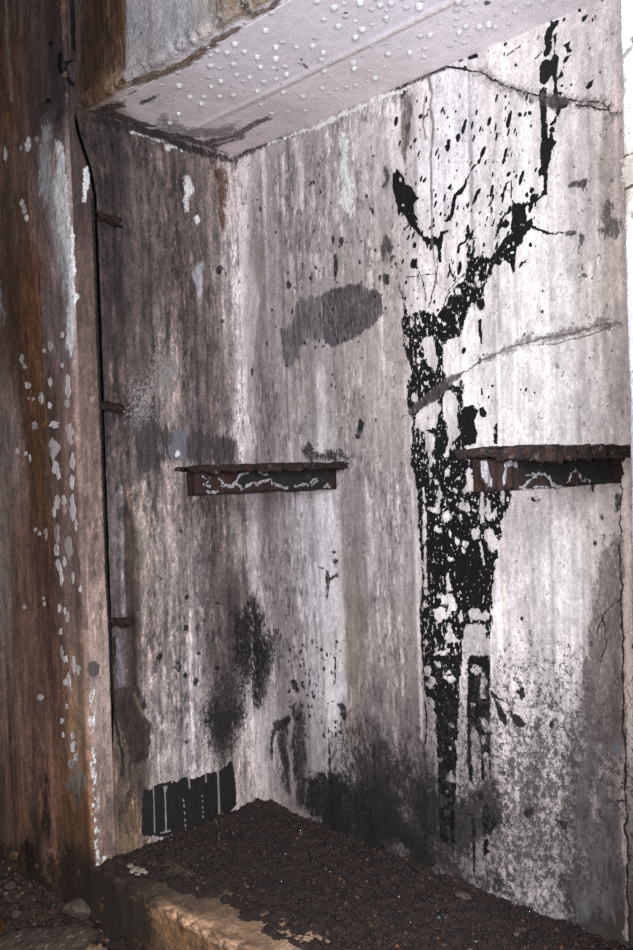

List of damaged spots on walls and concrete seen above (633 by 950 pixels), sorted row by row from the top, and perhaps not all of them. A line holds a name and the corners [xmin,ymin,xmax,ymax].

corrosion [78,0,127,122]
leakage [117,26,240,88]
crack [446,66,621,123]
leakage [524,20,567,206]
crack [620,153,633,189]
peeling [24,377,52,409]
crack [401,318,621,419]
peeling [32,421,82,592]
leakage [318,551,338,598]
peeling [58,604,81,769]
leakage [185,595,346,810]
crack [596,477,632,948]